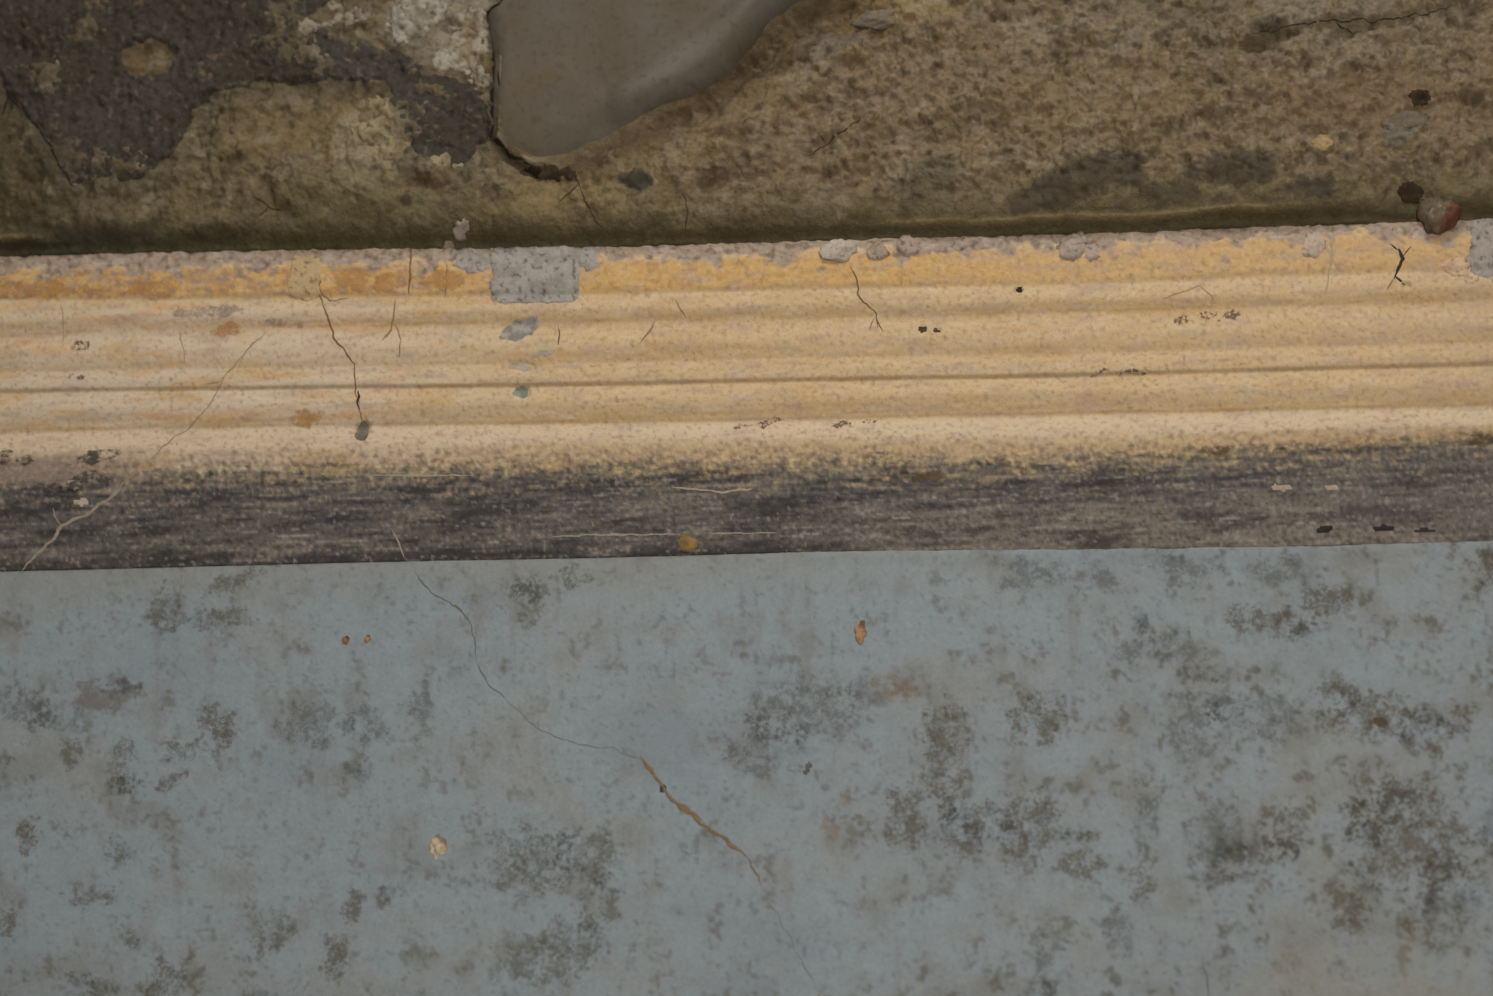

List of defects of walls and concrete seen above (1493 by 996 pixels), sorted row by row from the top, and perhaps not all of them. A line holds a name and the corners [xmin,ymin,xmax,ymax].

crack [318,263,363,422]
crack [382,248,448,357]
peeling [578,247,598,272]
crack [21,332,266,572]
crack [416,573,820,996]